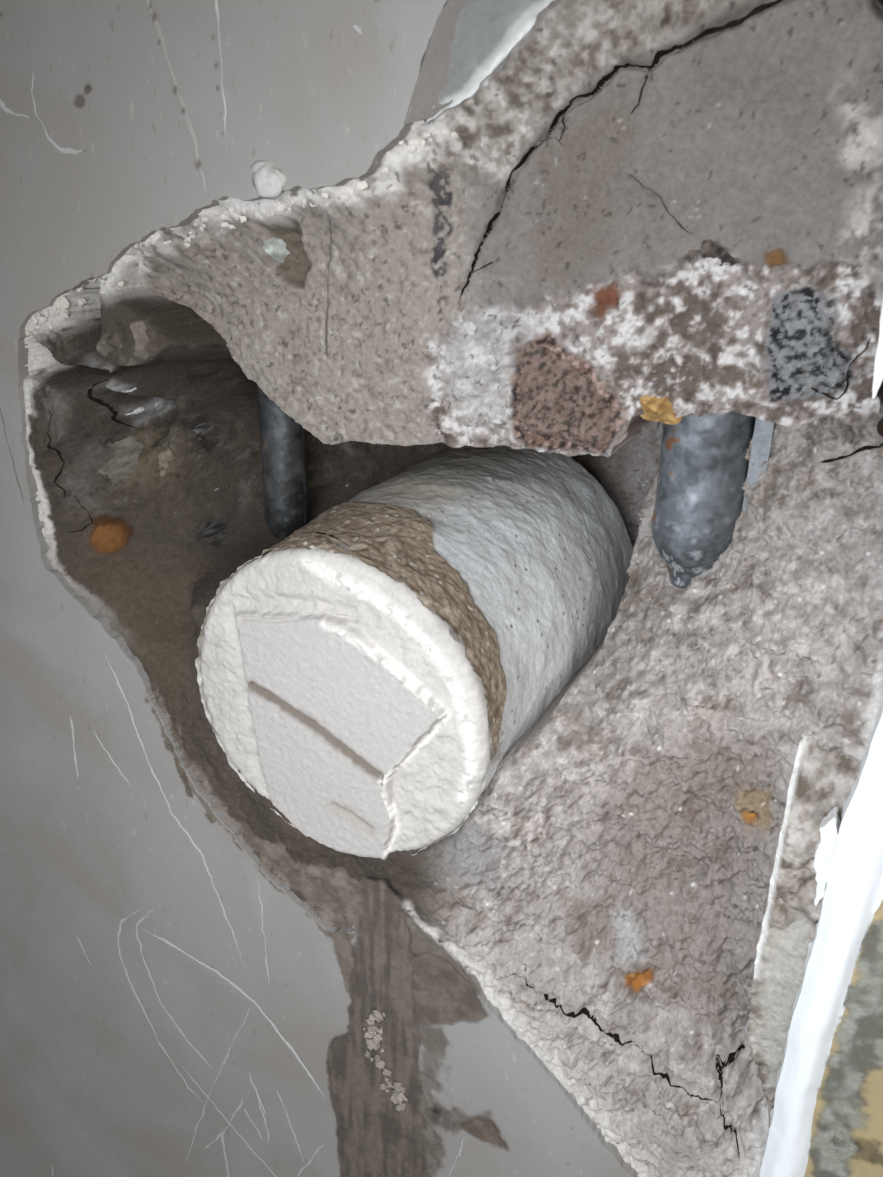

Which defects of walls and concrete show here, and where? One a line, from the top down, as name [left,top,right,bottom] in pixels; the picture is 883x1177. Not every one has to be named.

peeling [403,0,554,126]
crack [458,0,782,309]
crack [75,363,148,430]
crack [47,410,93,532]
corrosion [90,515,132,553]
spalling [23,247,883,1177]
damp [146,683,508,1177]
corrosion [623,969,653,992]
crack [509,973,745,1155]